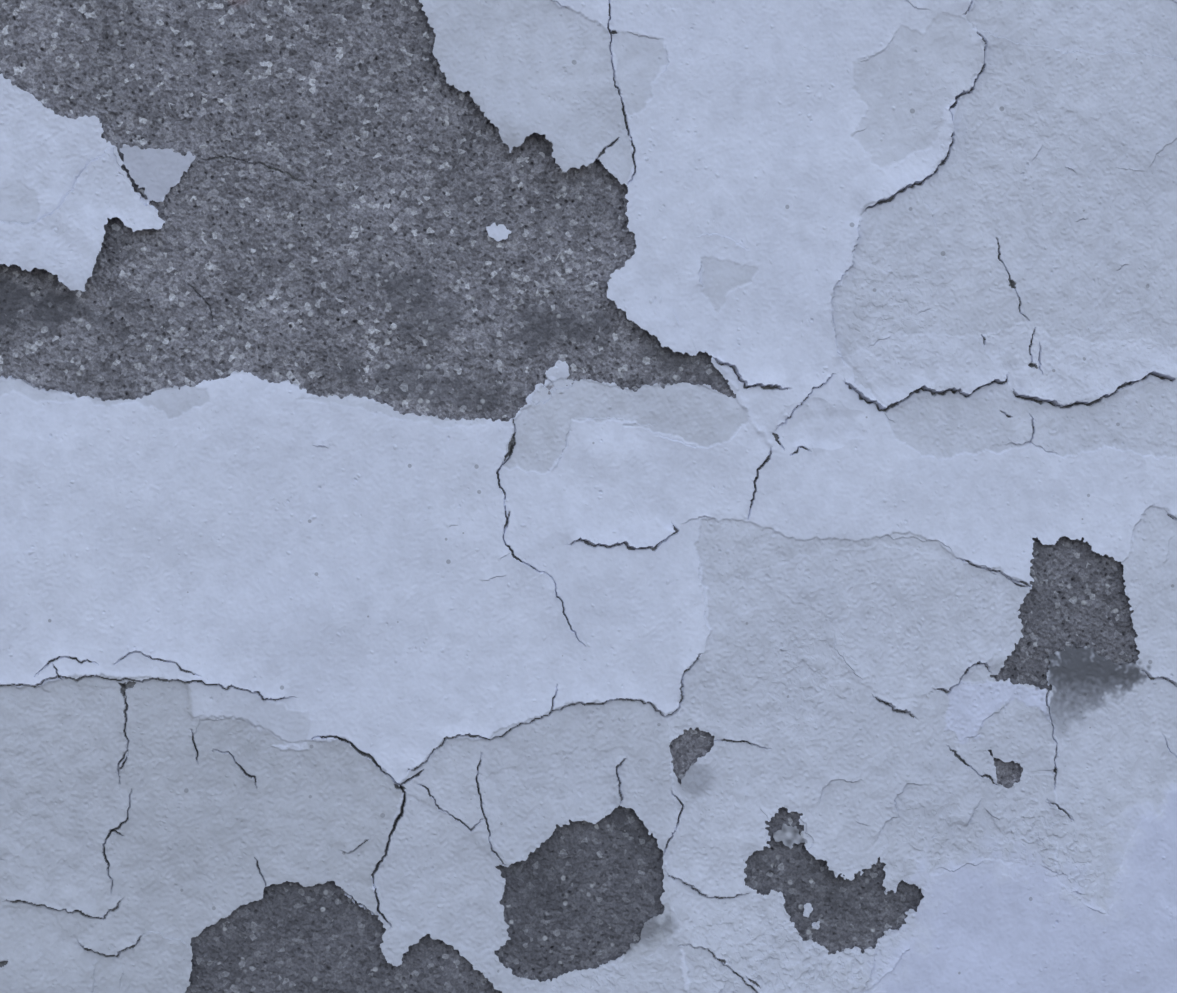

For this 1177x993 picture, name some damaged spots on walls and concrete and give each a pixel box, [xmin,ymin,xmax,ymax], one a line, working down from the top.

crack [597,77,636,175]
peeling [0,0,796,473]
peeling [830,0,1177,460]
crack [496,419,536,570]
crack [750,433,807,508]
crack [47,657,92,679]
crack [119,656,195,768]
peeling [0,506,1177,993]
crack [950,749,997,785]
crack [102,817,128,869]
crack [320,735,503,922]
crack [708,950,761,993]